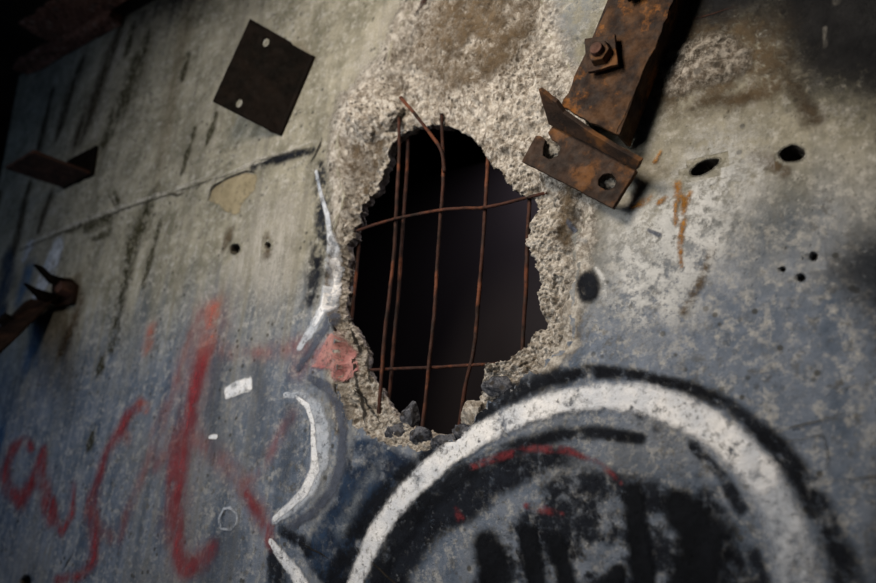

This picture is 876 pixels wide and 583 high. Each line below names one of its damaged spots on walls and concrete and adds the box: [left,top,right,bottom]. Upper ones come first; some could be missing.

damp [72,0,208,152]
damp [180,126,196,175]
flaking render [207,160,266,215]
spalling [325,0,606,452]
corrosion [629,182,691,268]